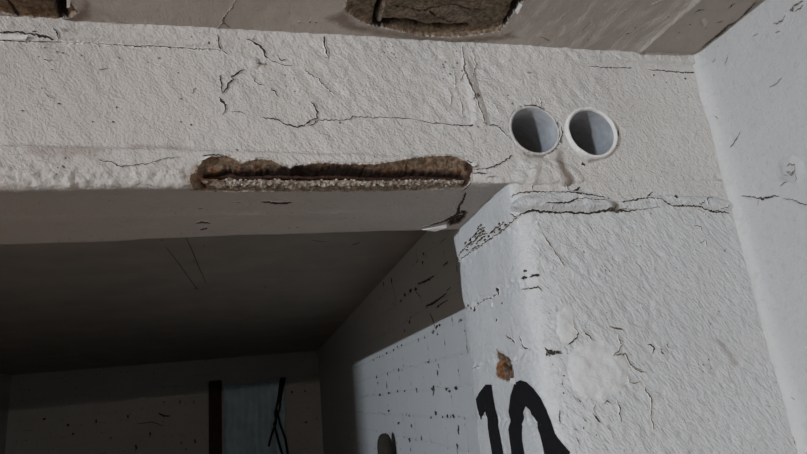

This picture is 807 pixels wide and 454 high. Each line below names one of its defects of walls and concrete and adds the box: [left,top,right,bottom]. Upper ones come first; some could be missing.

crack [0,0,236,55]
spalling [343,0,526,43]
crack [97,157,180,168]
spalling [186,153,477,192]
crack [219,36,512,243]
crack [510,163,807,268]
crack [568,320,594,345]
crack [610,326,670,432]
crack [558,375,623,445]